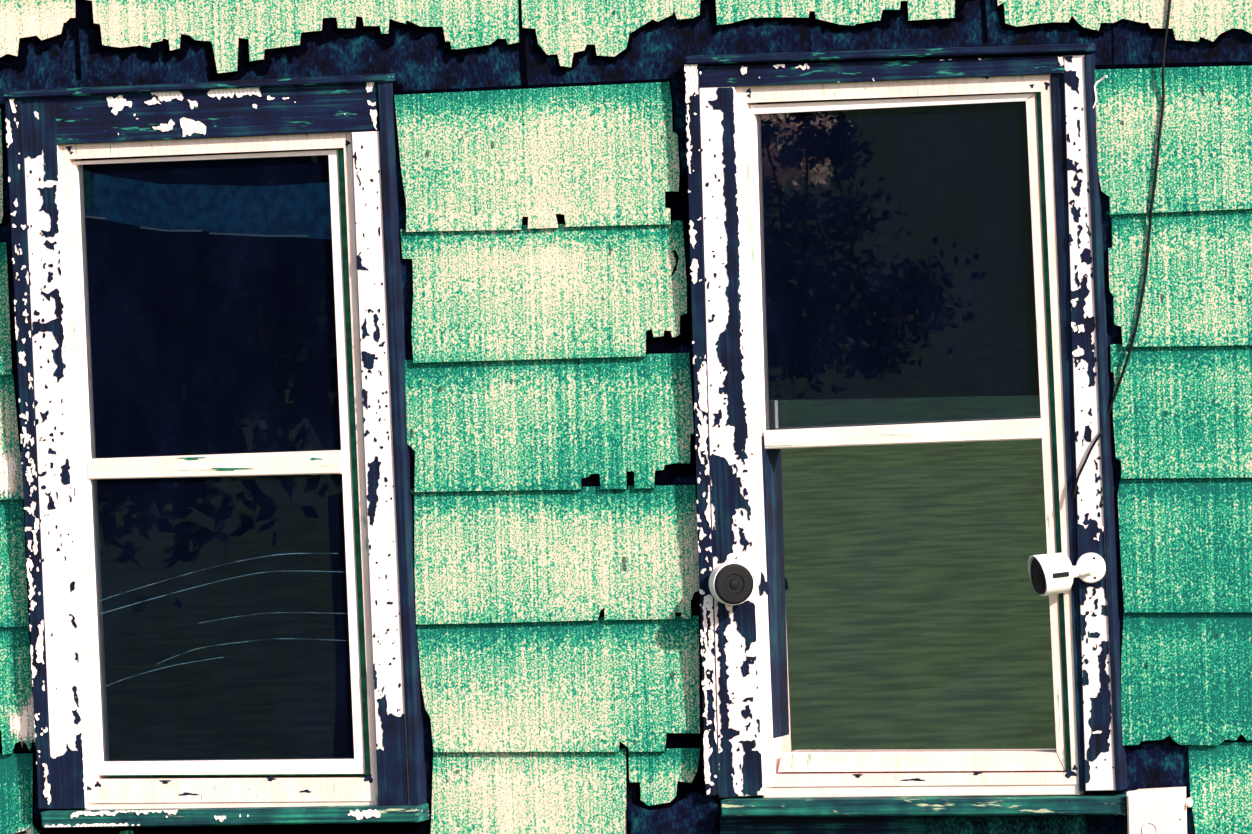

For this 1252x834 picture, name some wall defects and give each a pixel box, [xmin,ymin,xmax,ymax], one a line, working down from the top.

peeling [5,98,76,691]
peeling [106,87,296,137]
peeling [179,457,255,471]
peeling [355,223,383,285]
peeling [366,82,377,130]
peeling [360,308,394,526]
peeling [684,64,760,574]
peeling [1029,56,1108,388]
peeling [34,686,199,827]
peeling [347,541,409,820]
peeling [699,572,770,797]
peeling [1065,408,1114,783]